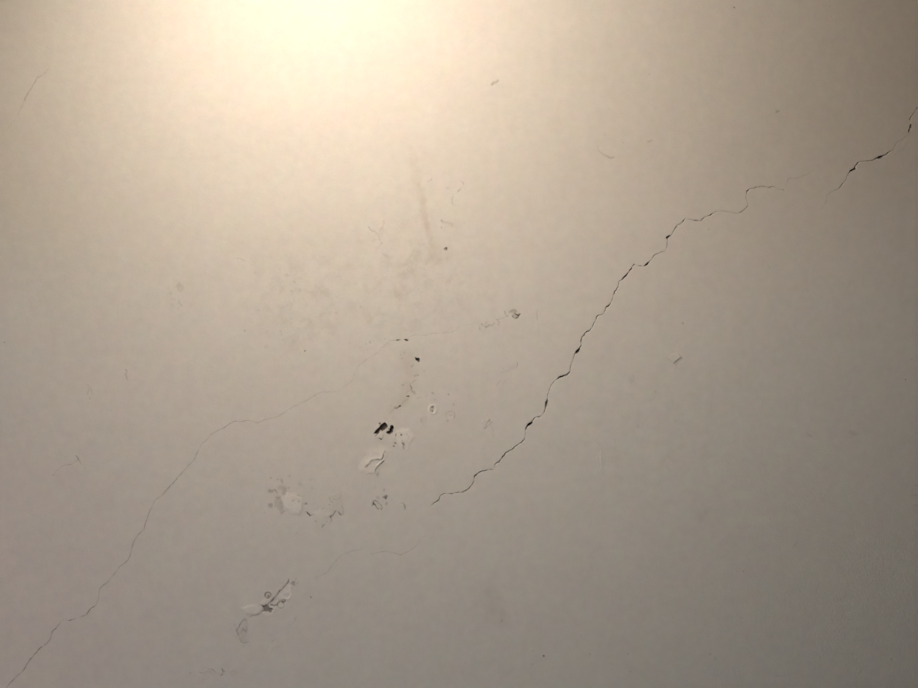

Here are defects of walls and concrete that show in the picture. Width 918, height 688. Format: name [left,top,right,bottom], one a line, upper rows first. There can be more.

crack [819,107,918,211]
crack [428,169,815,509]
flaking render [369,419,401,444]
crack [6,323,476,688]
flaking render [239,576,300,619]